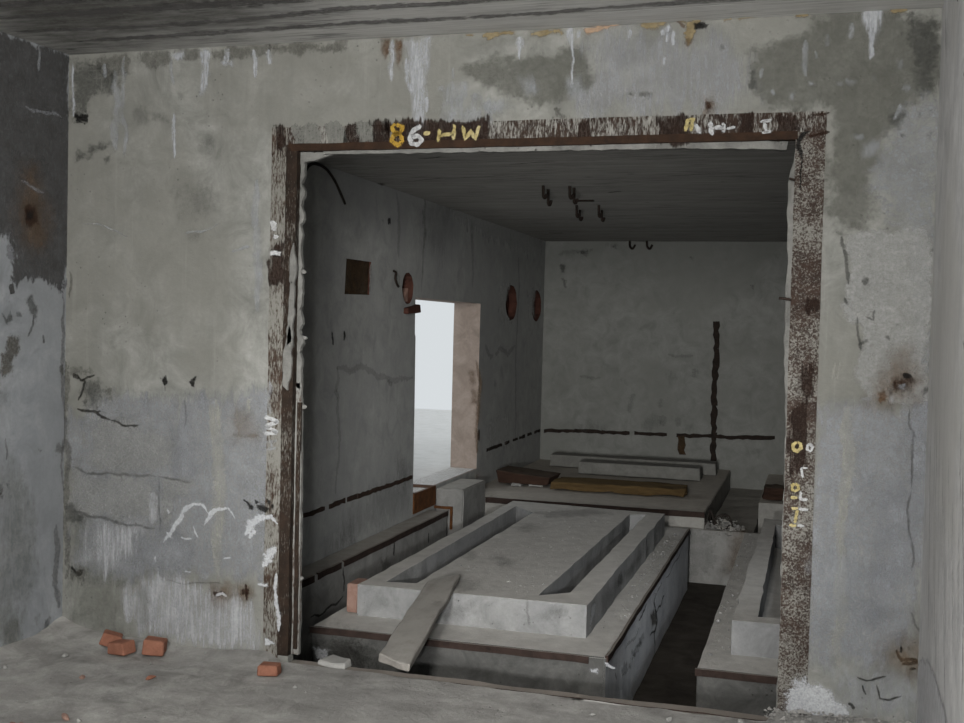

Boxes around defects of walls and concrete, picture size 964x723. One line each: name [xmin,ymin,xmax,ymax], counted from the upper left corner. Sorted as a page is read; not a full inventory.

damp [390,37,430,123]
rust [273,124,285,151]
rust [369,114,490,148]
rust [578,119,592,146]
rust [656,112,691,148]
damp [471,11,940,226]
rust [738,112,753,142]
peeling [0,32,69,294]
rust [267,240,285,287]
spalling [0,337,20,376]
crack [73,373,138,427]
rust [786,362,816,476]